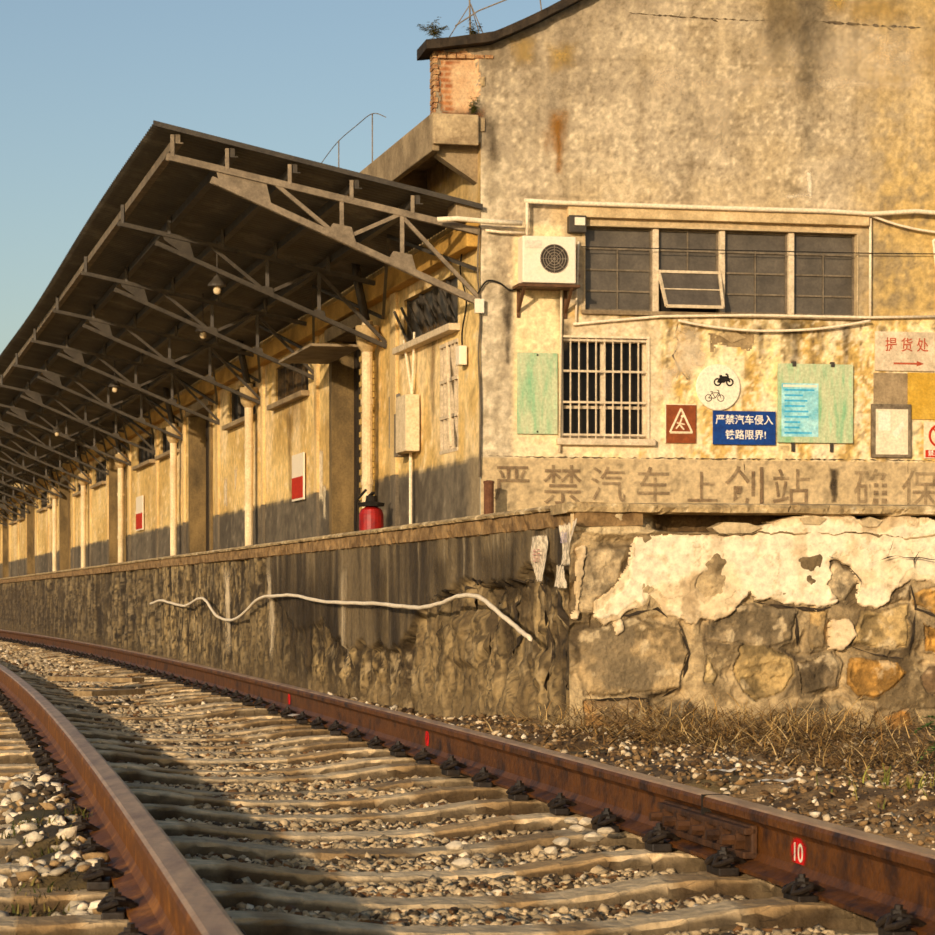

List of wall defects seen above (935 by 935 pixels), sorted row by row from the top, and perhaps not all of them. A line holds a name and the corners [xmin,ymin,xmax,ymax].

crack [628,12,768,22]
crack [822,21,921,31]
flaking render [437,49,485,114]
flaking render [570,545,586,620]
flaking render [593,515,935,636]
flaking render [827,619,857,651]